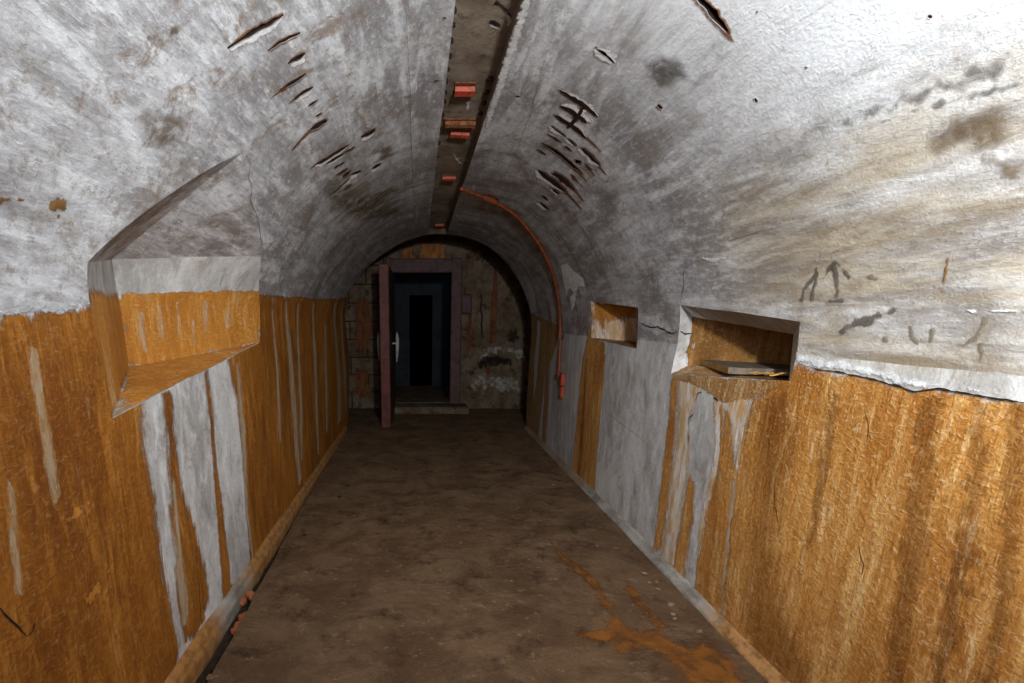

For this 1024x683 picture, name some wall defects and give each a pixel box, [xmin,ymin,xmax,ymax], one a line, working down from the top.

damp [651,59,684,86]
damp [910,59,1018,107]
damp [940,111,1004,160]
spalling [330,163,382,198]
rust [50,197,67,218]
crack [639,322,692,335]
damp [478,346,526,360]
damp [471,372,522,395]
rust [573,301,638,490]
rust [0,289,350,683]
rust [653,317,1024,683]
rust [554,547,744,683]